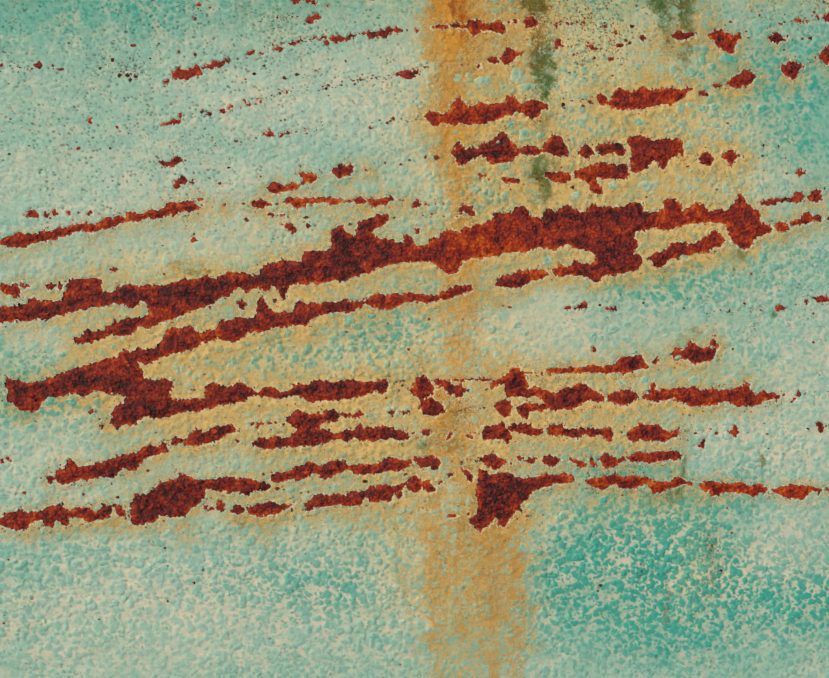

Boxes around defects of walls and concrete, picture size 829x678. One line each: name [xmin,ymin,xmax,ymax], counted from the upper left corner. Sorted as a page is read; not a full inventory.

damp [522,0,547,16]
damp [531,50,549,85]
corrosion [249,156,373,235]
damp [529,154,554,198]
corrosion [0,183,829,678]